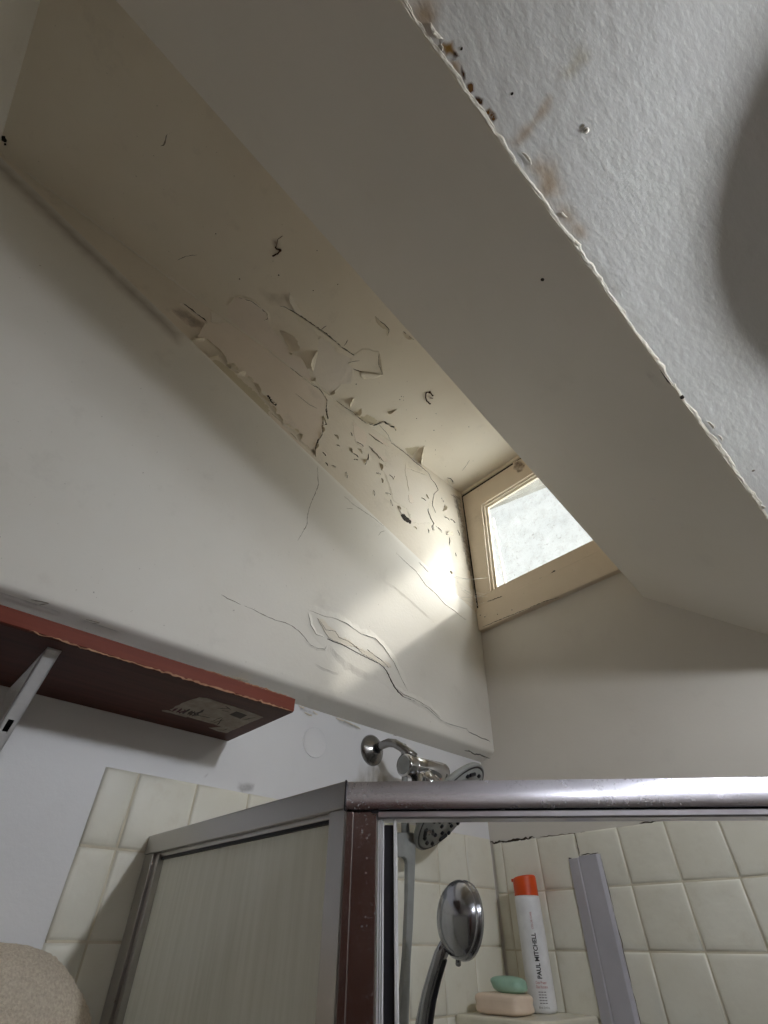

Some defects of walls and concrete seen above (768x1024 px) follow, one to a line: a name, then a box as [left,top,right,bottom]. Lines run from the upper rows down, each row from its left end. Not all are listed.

rust [439,37,496,121]
crack [291,368,461,538]
peeling [334,422,461,557]
crack [383,552,559,625]
crack [222,595,489,758]